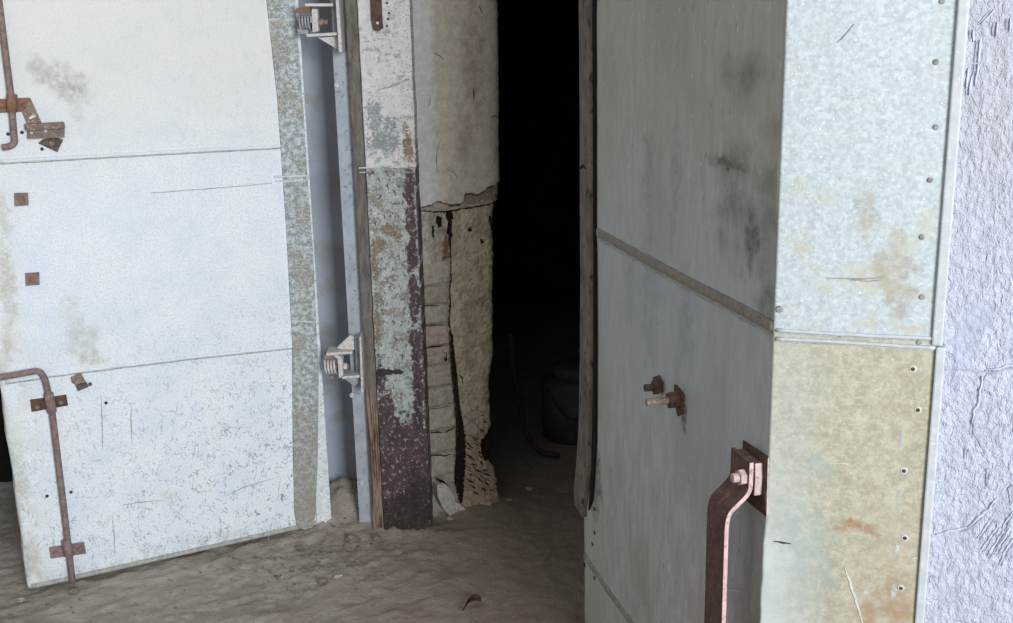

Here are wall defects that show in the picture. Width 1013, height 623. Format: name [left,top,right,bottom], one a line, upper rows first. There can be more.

spalling [363,85,499,530]
crack [944,364,1013,454]